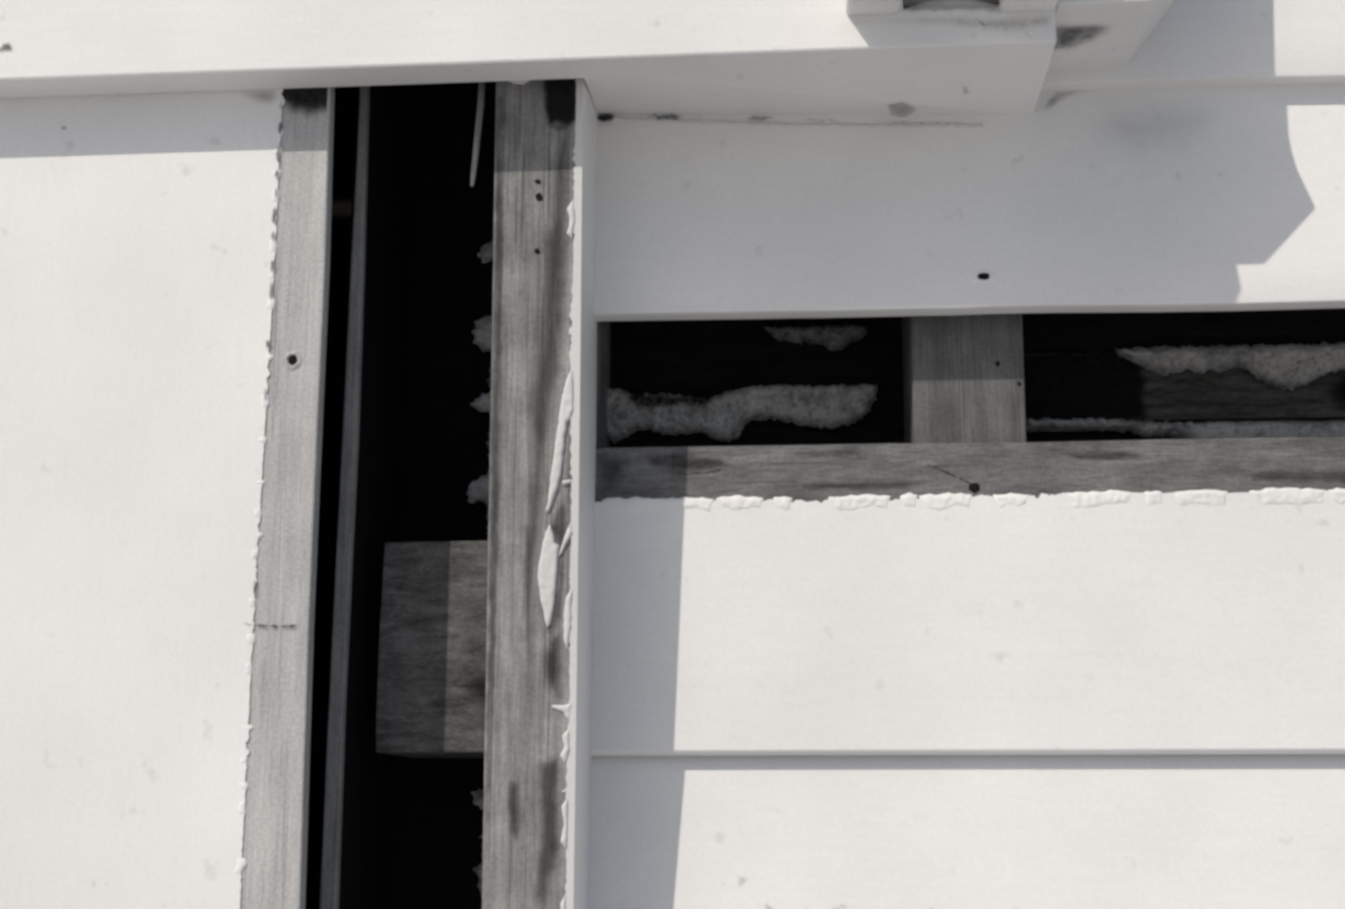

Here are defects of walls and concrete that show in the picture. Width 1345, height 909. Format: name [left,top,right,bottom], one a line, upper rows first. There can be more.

peeling [267,124,284,311]
peeling [567,198,575,239]
peeling [538,370,574,650]
peeling [602,495,792,512]
peeling [829,493,972,511]
peeling [993,493,1029,508]
peeling [1066,490,1228,508]
peeling [1249,488,1345,505]
peeling [552,703,572,764]